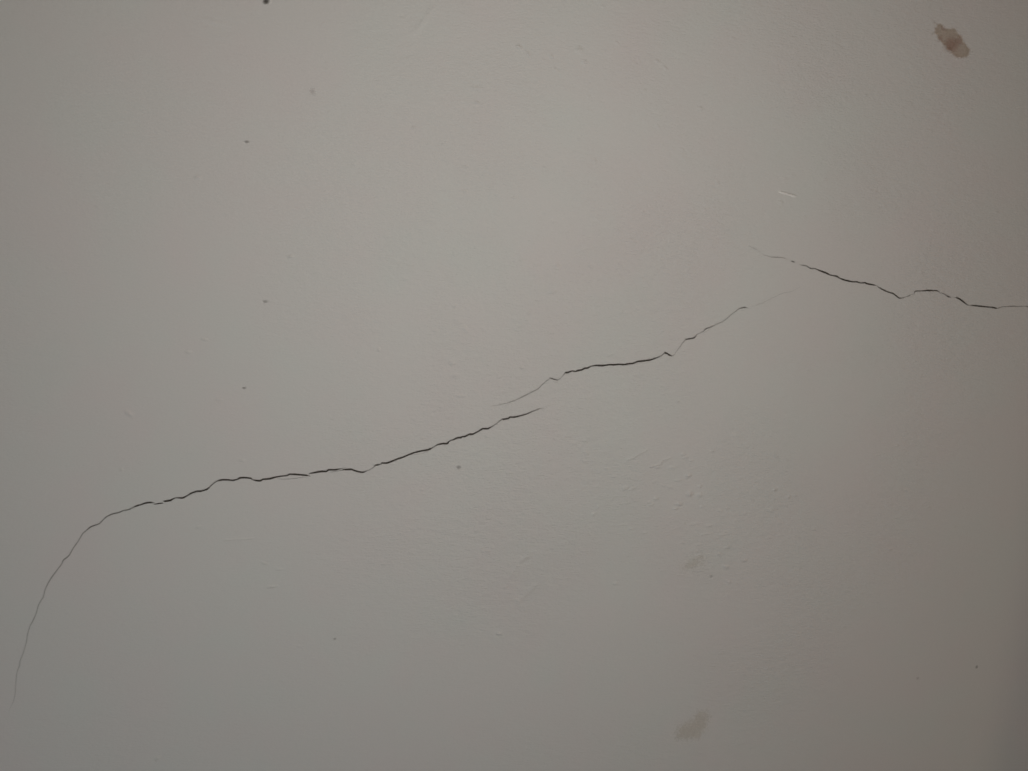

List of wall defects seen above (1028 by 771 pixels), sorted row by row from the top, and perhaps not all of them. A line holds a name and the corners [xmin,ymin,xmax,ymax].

crack [792,261,997,309]
crack [551,327,710,383]
crack [87,411,533,530]